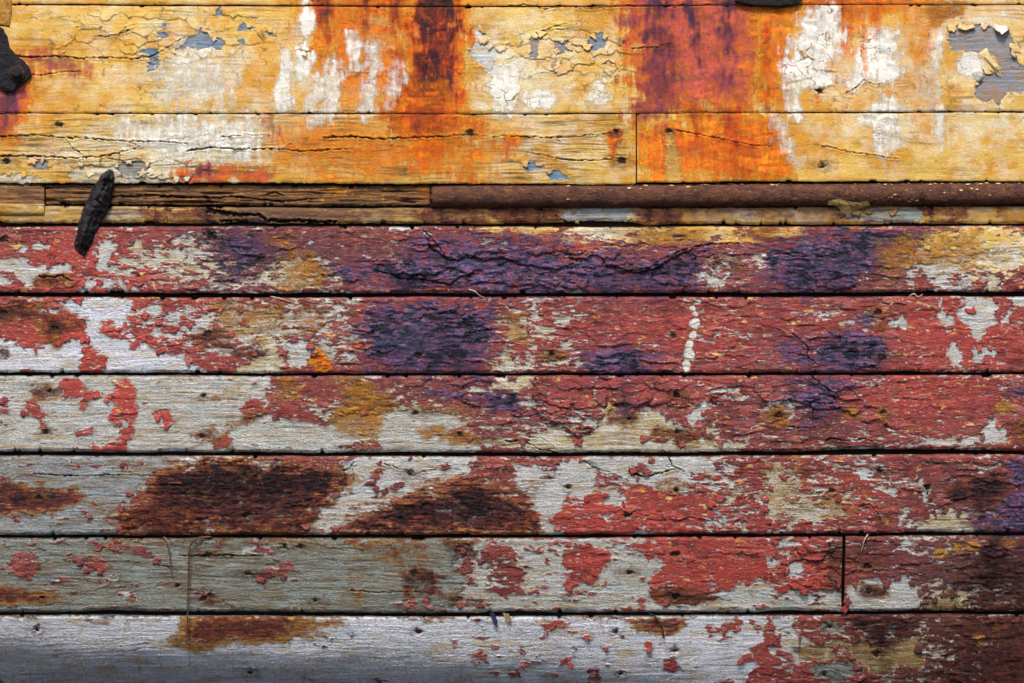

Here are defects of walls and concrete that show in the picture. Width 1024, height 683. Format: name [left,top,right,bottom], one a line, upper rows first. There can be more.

crack [0,133,623,161]
rust [139,0,521,230]
peeling [467,25,507,76]
peeling [526,31,608,58]
rust [607,0,968,182]
peeling [947,21,1024,106]
crack [377,230,492,335]
crack [611,243,740,284]
rust [0,477,89,517]
rust [105,397,545,623]
peeling [0,237,977,683]
rust [166,592,347,654]